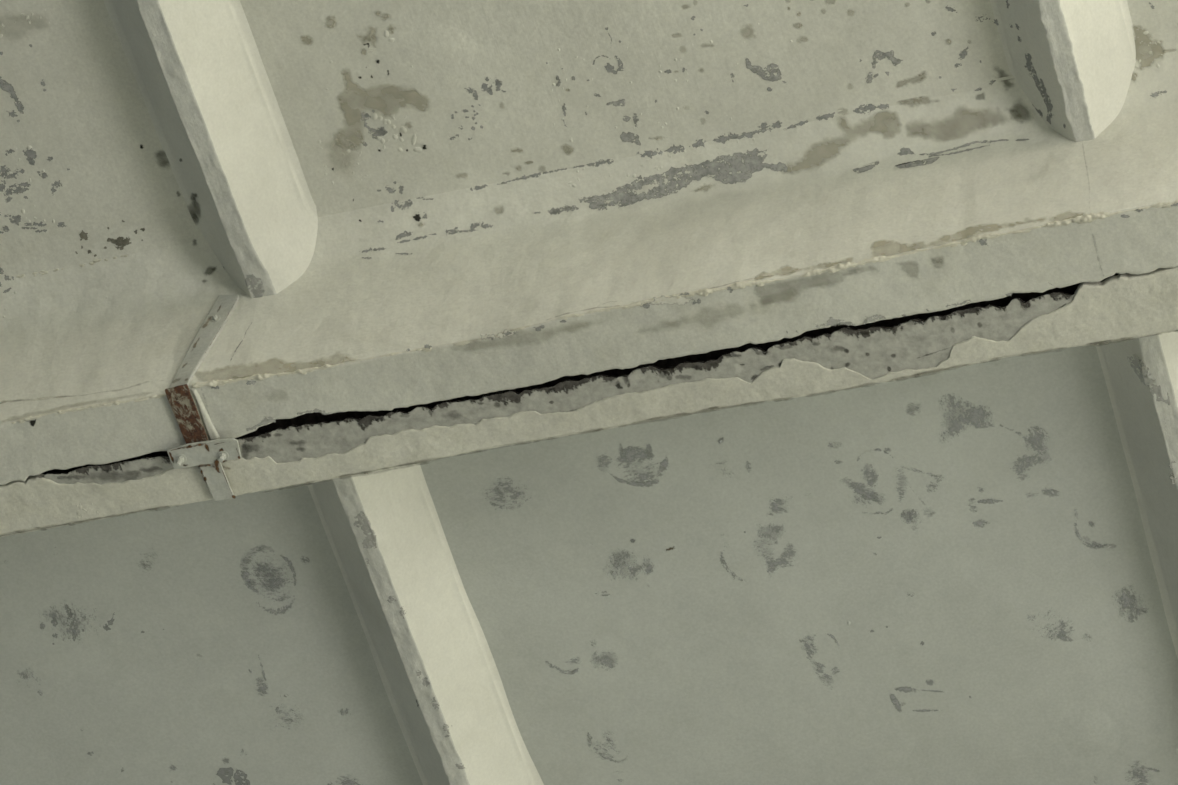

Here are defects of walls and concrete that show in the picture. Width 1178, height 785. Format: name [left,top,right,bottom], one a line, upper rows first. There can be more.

peeling [746,59,786,91]
peeling [0,77,24,122]
leakage [338,73,424,147]
peeling [450,77,506,140]
peeling [0,148,70,233]
peeling [502,159,613,184]
spalling [535,94,835,215]
peeling [897,139,1029,168]
peeling [396,223,492,255]
crack [235,273,1130,439]
leakage [647,402,758,422]
crack [0,451,169,486]